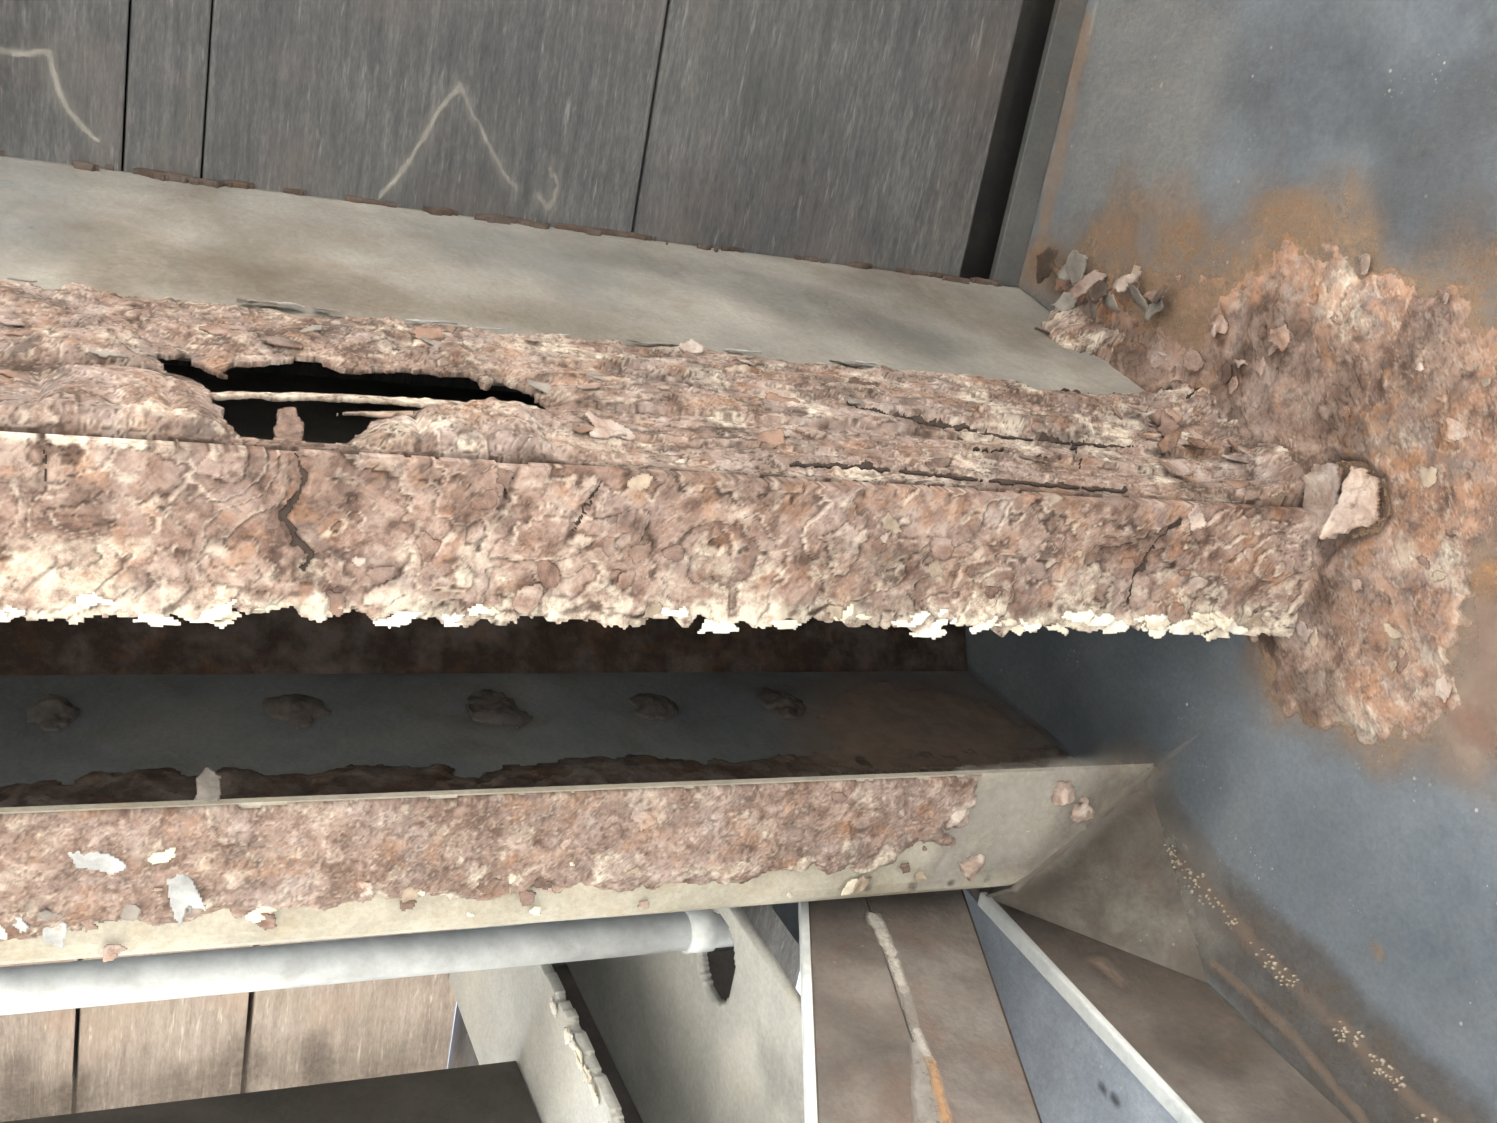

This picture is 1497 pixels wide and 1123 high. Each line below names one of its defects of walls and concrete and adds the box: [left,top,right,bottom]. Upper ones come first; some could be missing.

peeling [273,407,304,441]
peeling [336,410,413,419]
rust [0,177,1497,765]
peeling [68,851,126,875]
peeling [166,874,206,926]
rust [0,679,1084,962]
rust [868,913,910,1005]
rust [914,1029,950,1123]